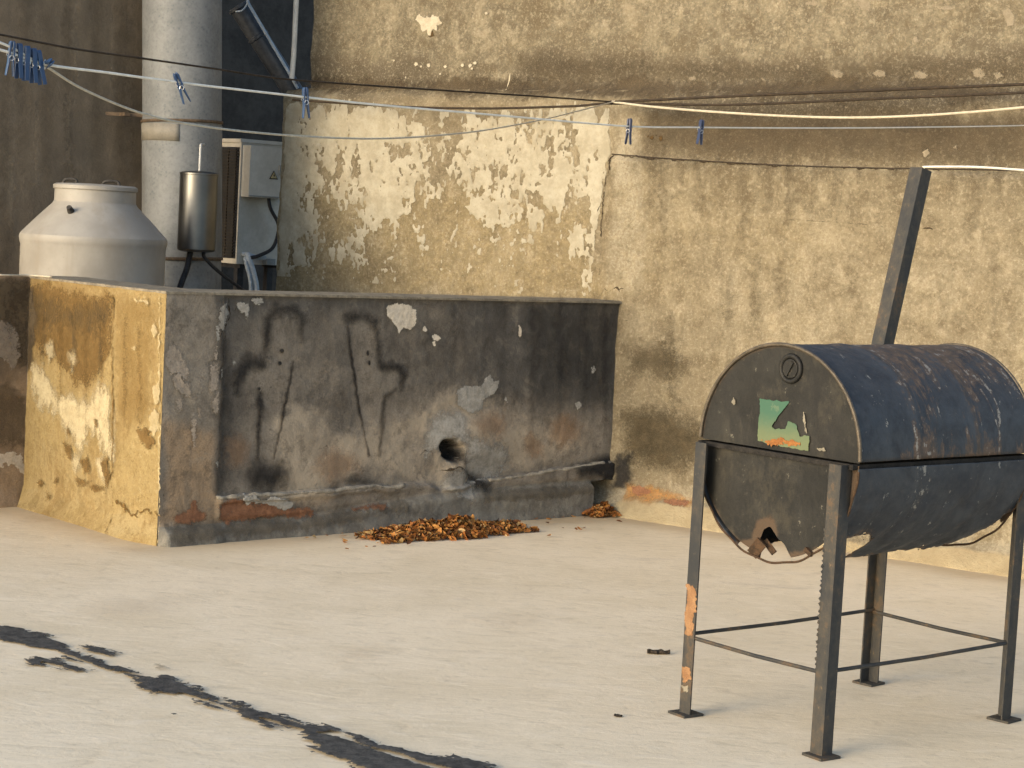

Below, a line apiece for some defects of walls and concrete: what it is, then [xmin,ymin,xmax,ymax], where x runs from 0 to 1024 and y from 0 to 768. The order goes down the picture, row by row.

spalling [415,14,442,37]
peeling [277,99,611,296]
spalling [386,303,441,346]
flaking render [456,374,508,413]
damp [62,428,110,494]
damp [578,406,704,488]